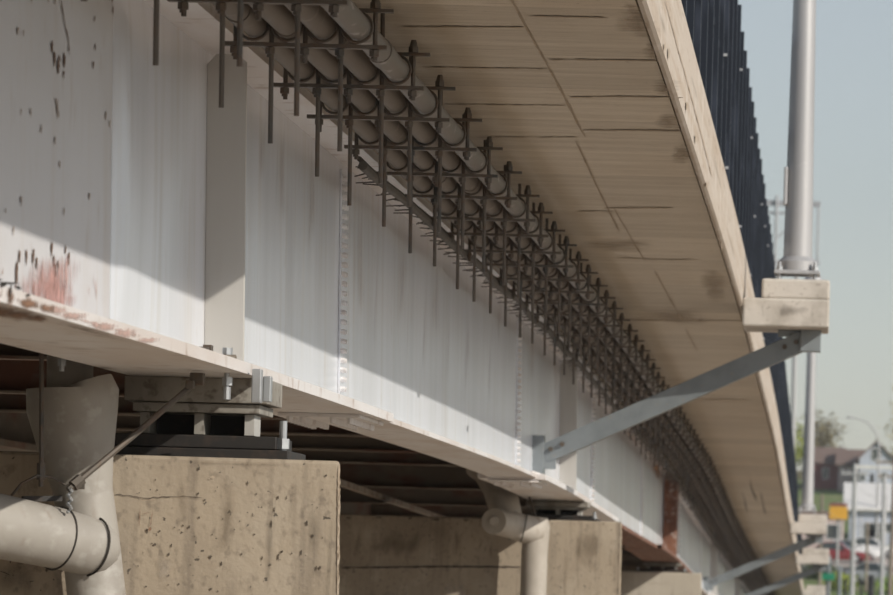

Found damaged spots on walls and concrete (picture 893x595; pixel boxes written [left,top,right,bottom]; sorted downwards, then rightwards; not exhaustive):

rust [0,262,154,343]